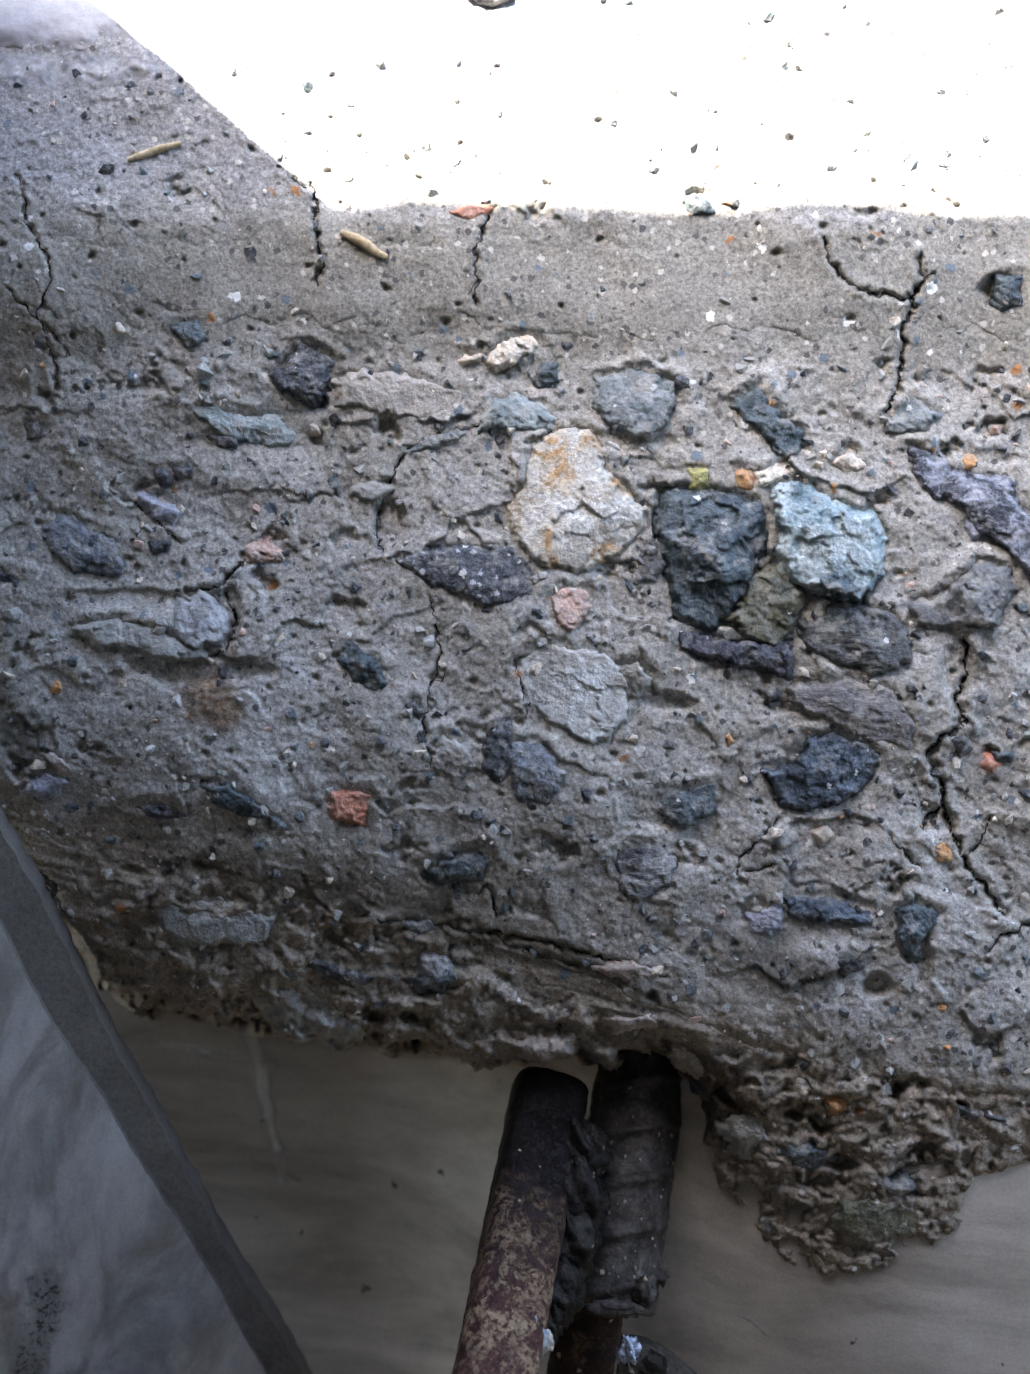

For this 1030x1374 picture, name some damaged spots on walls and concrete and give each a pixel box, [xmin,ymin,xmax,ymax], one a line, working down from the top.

spalling [373,56,391,80]
spalling [573,0,676,141]
spalling [769,37,860,109]
crack [9,177,68,384]
crack [291,178,326,287]
spalling [0,61,1030,303]
crack [823,236,937,414]
spalling [0,273,1030,1319]
crack [888,639,1030,952]